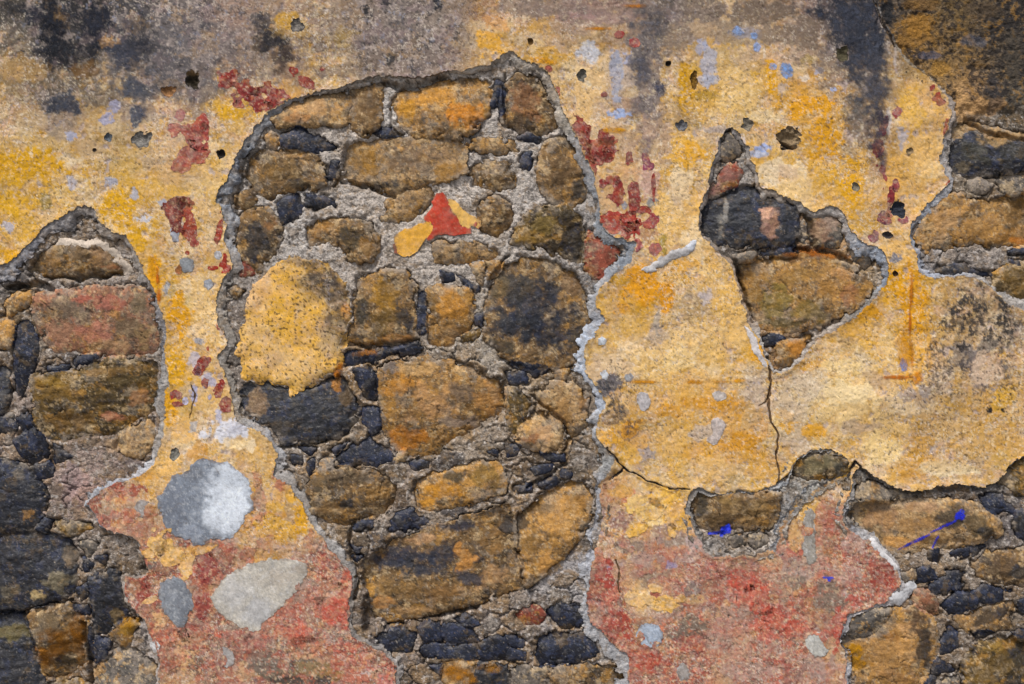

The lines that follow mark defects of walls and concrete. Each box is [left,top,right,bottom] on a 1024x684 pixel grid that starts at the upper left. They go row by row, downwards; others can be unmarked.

damp [1,0,108,65]
damp [253,14,289,73]
peeling [614,30,640,47]
damp [806,0,890,166]
spalling [0,196,324,684]
spalling [192,51,1024,684]
crack [606,447,690,490]
crack [759,366,788,484]